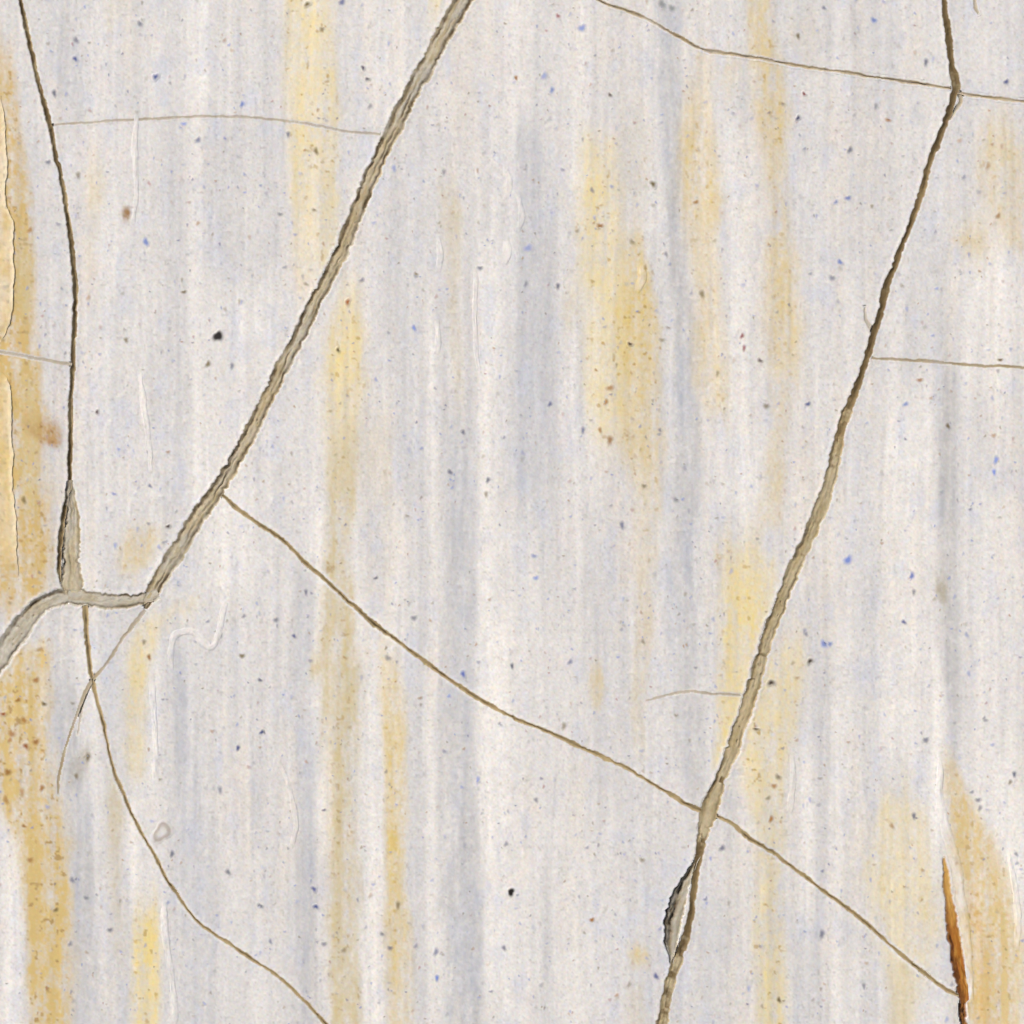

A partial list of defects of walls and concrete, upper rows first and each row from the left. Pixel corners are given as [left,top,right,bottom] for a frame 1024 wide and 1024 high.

crack [0,0,702,1024]
spalling [659,855,700,965]
crack [592,0,1024,1024]
corrosion [940,732,1024,1024]